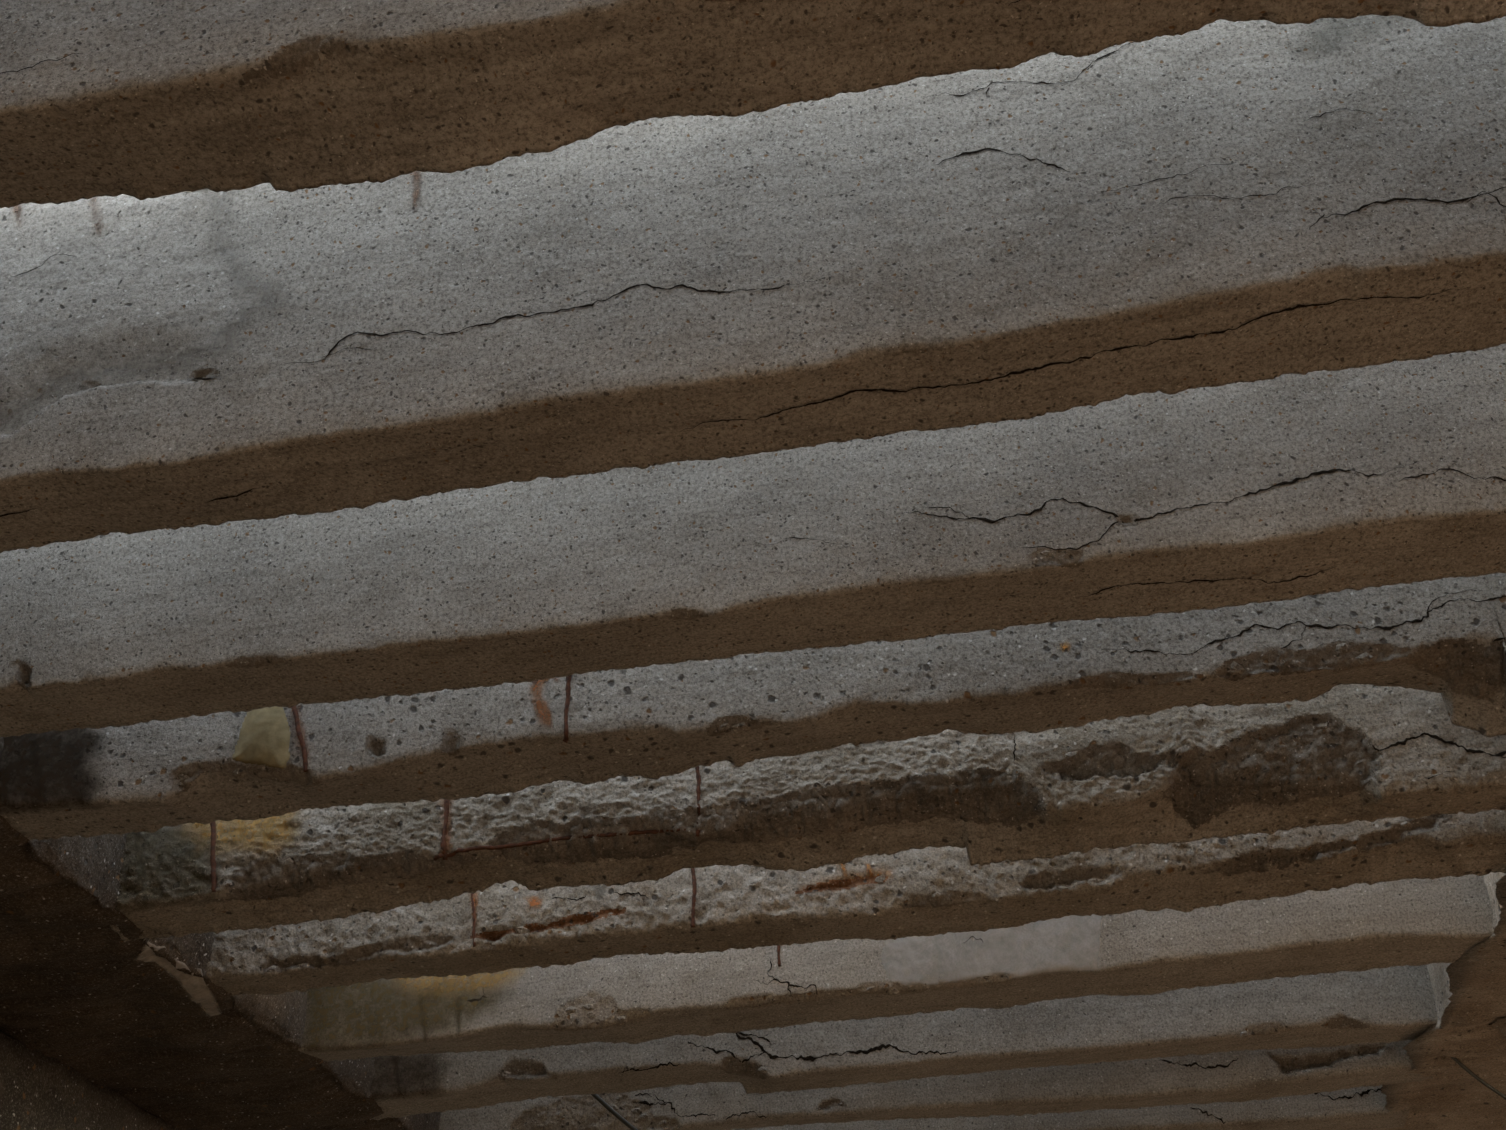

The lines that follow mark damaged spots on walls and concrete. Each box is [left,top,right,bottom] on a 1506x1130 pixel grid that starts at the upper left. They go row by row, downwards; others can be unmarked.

crack [936,148,1069,172]
crack [1099,162,1506,230]
crack [287,279,820,364]
crack [906,462,1506,550]
crack [1084,566,1337,597]
crack [1101,590,1506,655]
rust [532,678,557,724]
spalling [210,712,1383,901]
spalling [902,891,981,909]
crack [618,1032,957,1120]